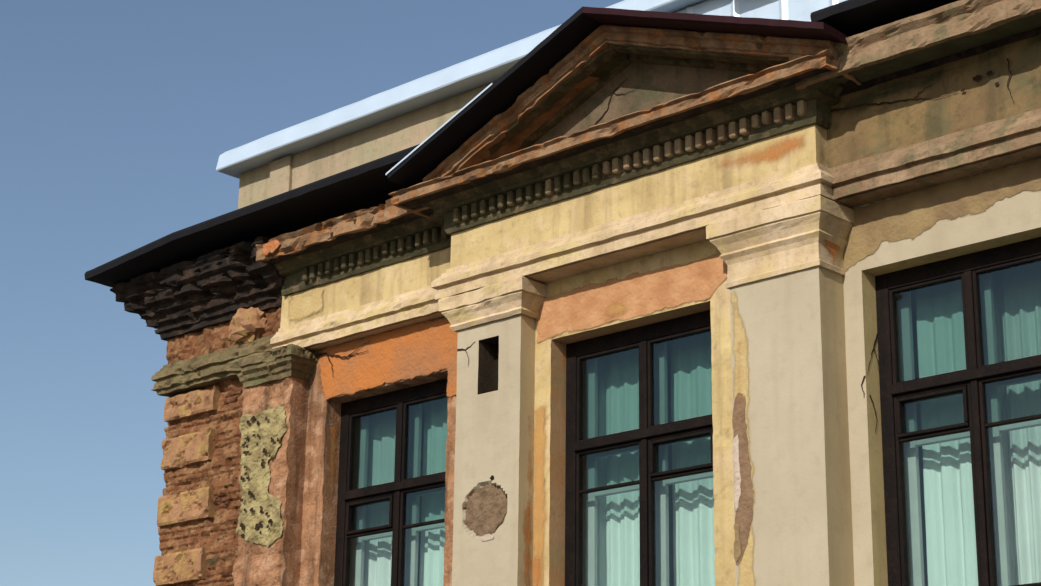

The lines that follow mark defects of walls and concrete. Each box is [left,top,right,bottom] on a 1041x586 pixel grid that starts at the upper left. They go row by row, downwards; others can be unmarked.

crack [593,78,641,126]
crack [830,82,957,112]
flaking render [262,240,280,255]
flaking render [843,158,1041,272]
flaking render [536,253,728,343]
crack [316,340,371,377]
crack [861,332,880,434]
flaking render [212,403,287,547]
flaking render [462,475,507,541]
flaking render [731,292,755,586]